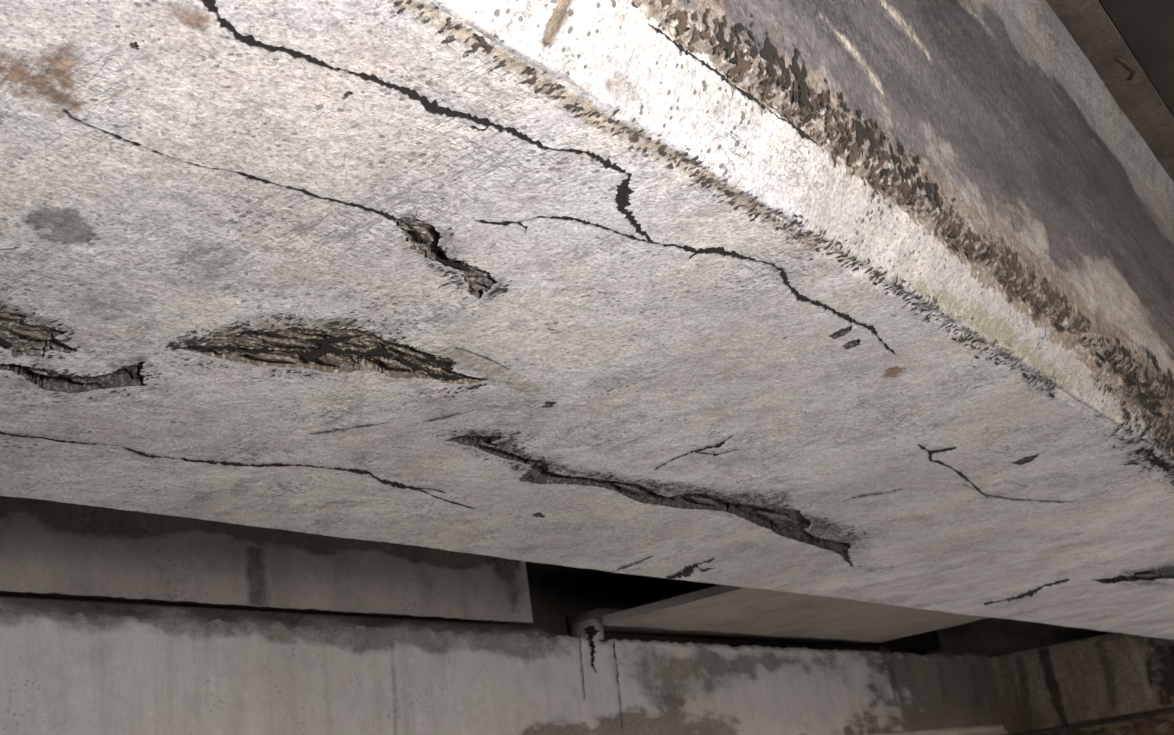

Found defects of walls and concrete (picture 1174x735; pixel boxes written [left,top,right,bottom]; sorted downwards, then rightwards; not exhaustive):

water stain [542,0,570,45]
crack [64,109,404,223]
crack [203,0,896,354]
water stain [716,0,1174,360]
spalling [0,289,169,401]
spalling [167,312,511,399]
crack [0,431,475,509]
water stain [0,496,520,605]
spalling [437,426,881,573]
crack [918,444,1065,503]
water stain [523,647,800,735]
water stain [845,650,1013,735]